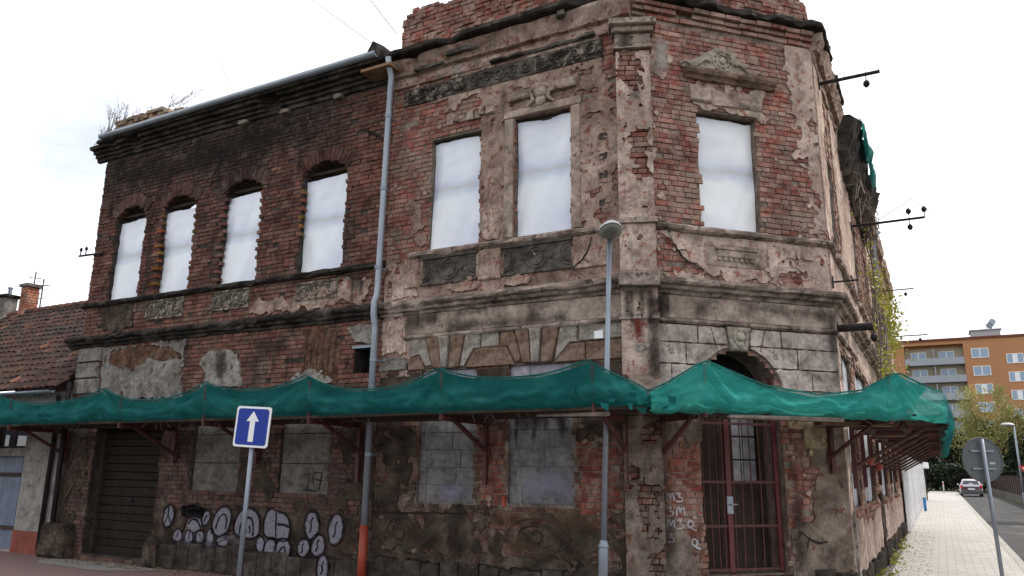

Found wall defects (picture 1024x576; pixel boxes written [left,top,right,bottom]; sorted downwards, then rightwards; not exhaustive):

spalling [594,132,608,182]
crack [669,234,706,272]
peeling [249,276,372,315]
peeling [347,319,407,372]
peeling [100,338,188,401]
peeling [199,349,244,388]
peeling [787,421,827,456]
spalling [784,456,814,529]
crack [802,532,829,550]